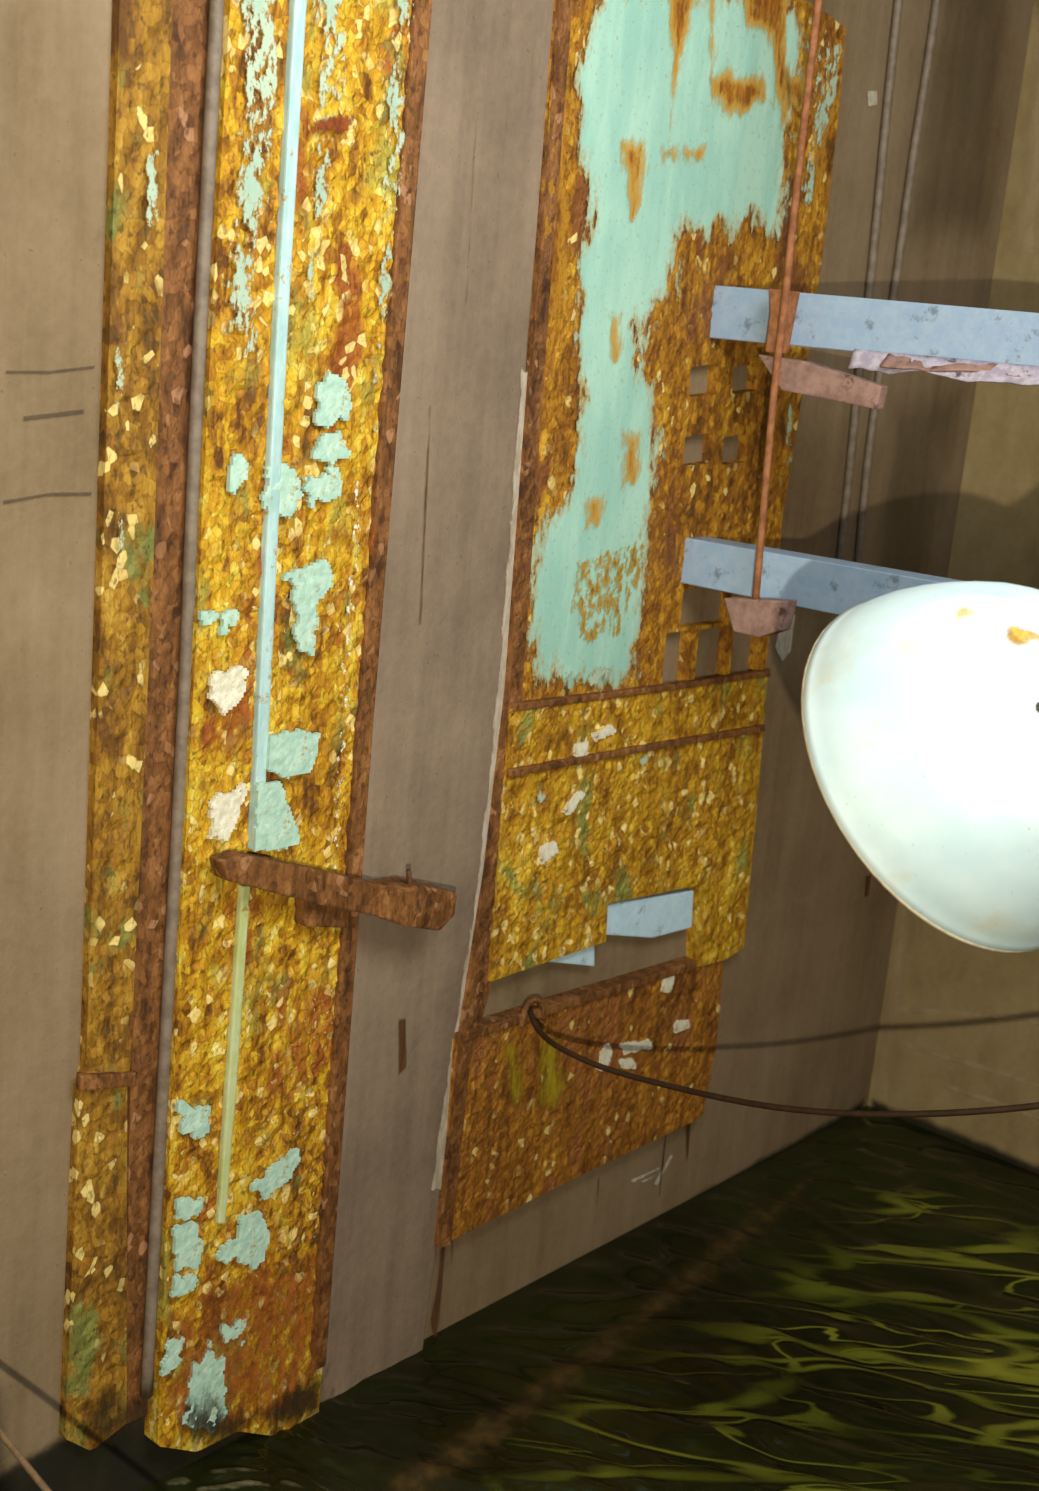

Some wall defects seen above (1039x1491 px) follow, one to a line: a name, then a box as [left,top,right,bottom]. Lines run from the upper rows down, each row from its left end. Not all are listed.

rust [310,113,353,134]
rust [621,140,706,221]
rust [669,0,805,126]
peeling [526,0,841,693]
rust [623,432,640,485]
peeling [198,609,240,635]
peeling [206,371,364,869]
rust [571,542,645,643]
peeling [175,1099,211,1140]
peeling [169,1110,319,1303]
peeling [159,1309,291,1432]
rust [169,1260,318,1427]